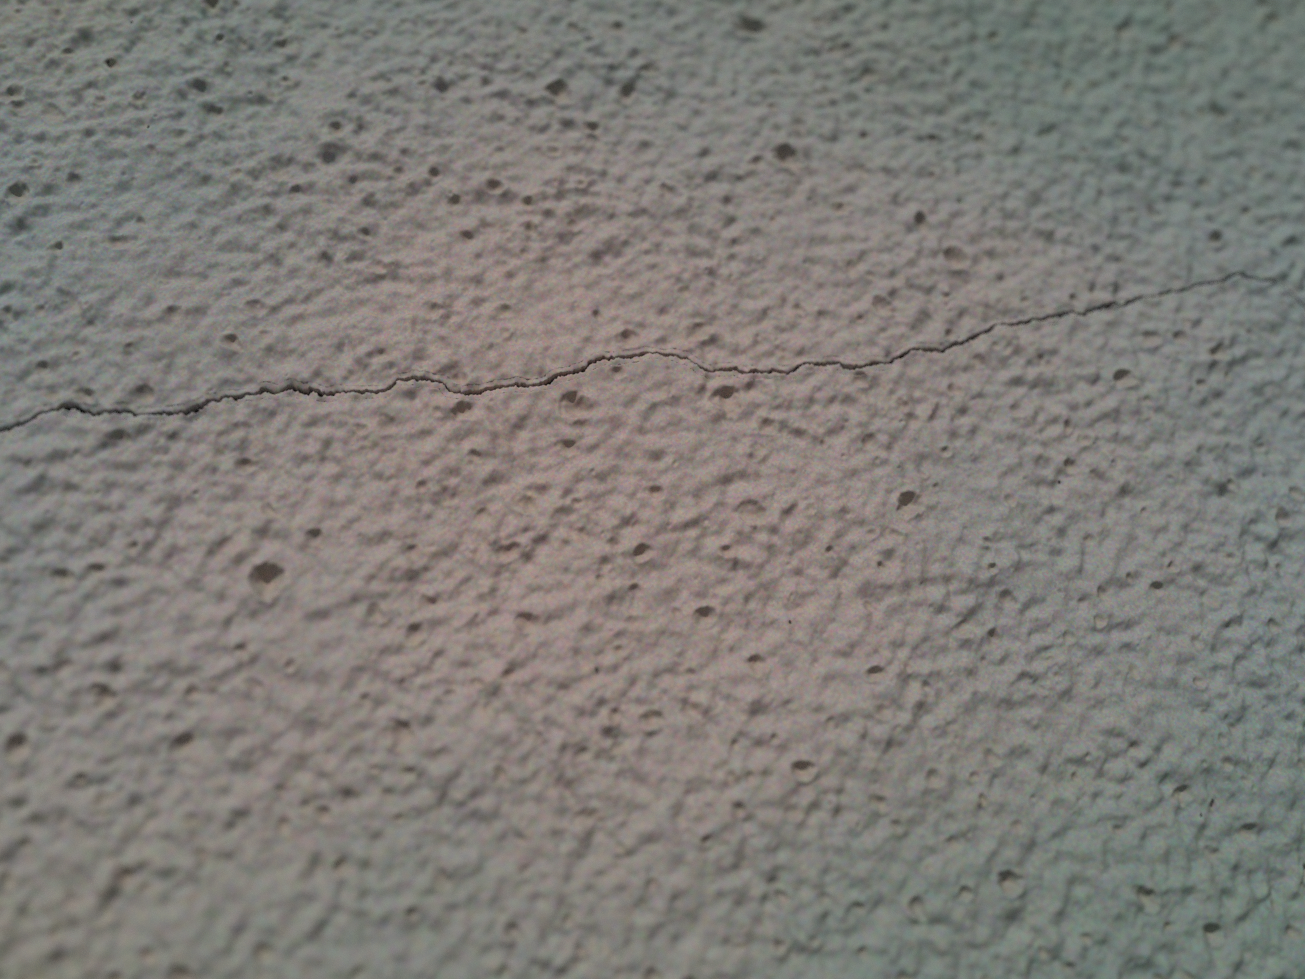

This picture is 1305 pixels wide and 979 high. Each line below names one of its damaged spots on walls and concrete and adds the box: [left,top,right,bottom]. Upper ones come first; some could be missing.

crack [0,267,1305,438]